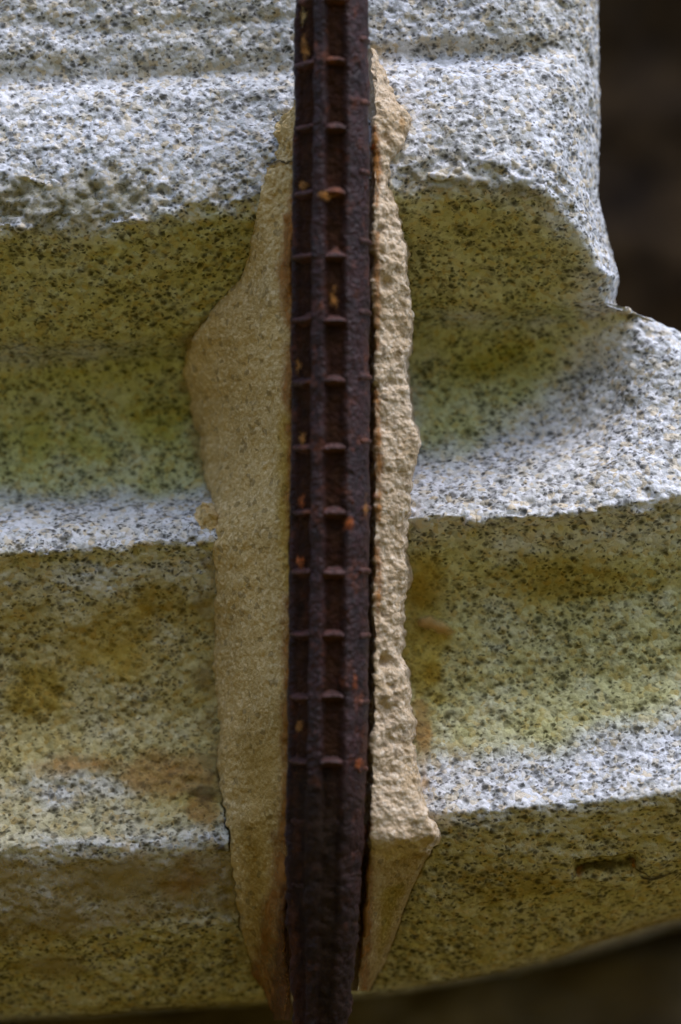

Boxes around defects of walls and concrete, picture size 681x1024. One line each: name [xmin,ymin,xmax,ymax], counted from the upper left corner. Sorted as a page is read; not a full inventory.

rust [371,126,382,207]
rust [279,198,293,326]
rust [282,349,305,528]
rust [278,597,301,840]
rust [357,823,373,991]